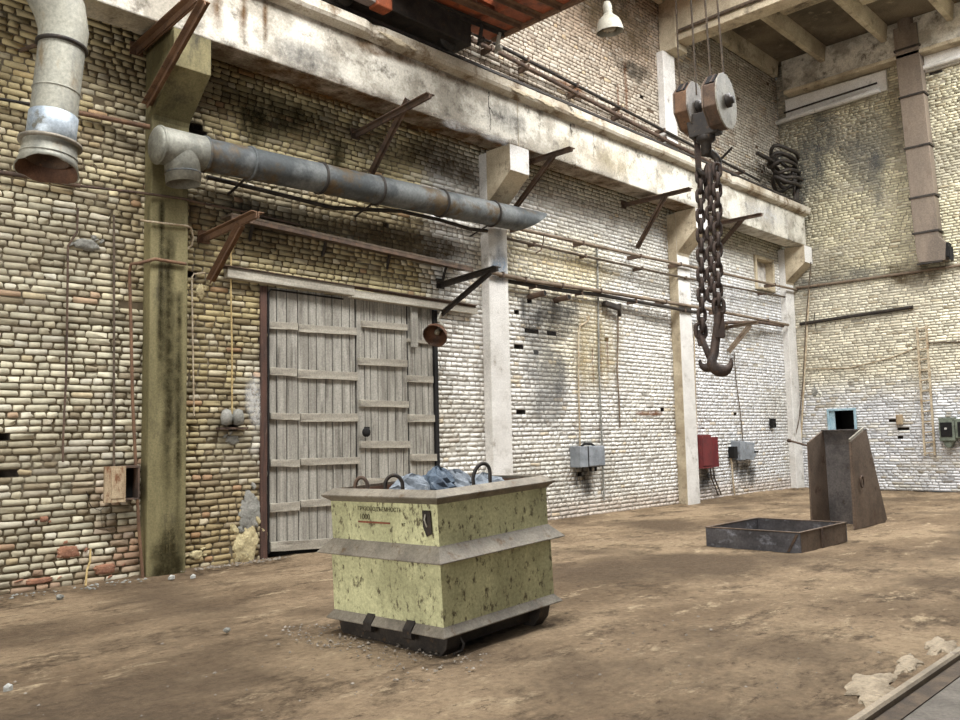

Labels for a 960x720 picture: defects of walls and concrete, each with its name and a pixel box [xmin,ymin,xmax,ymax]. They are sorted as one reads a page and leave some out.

damp [158,204,181,474]
damp [154,530,182,576]
spalling [230,482,268,562]